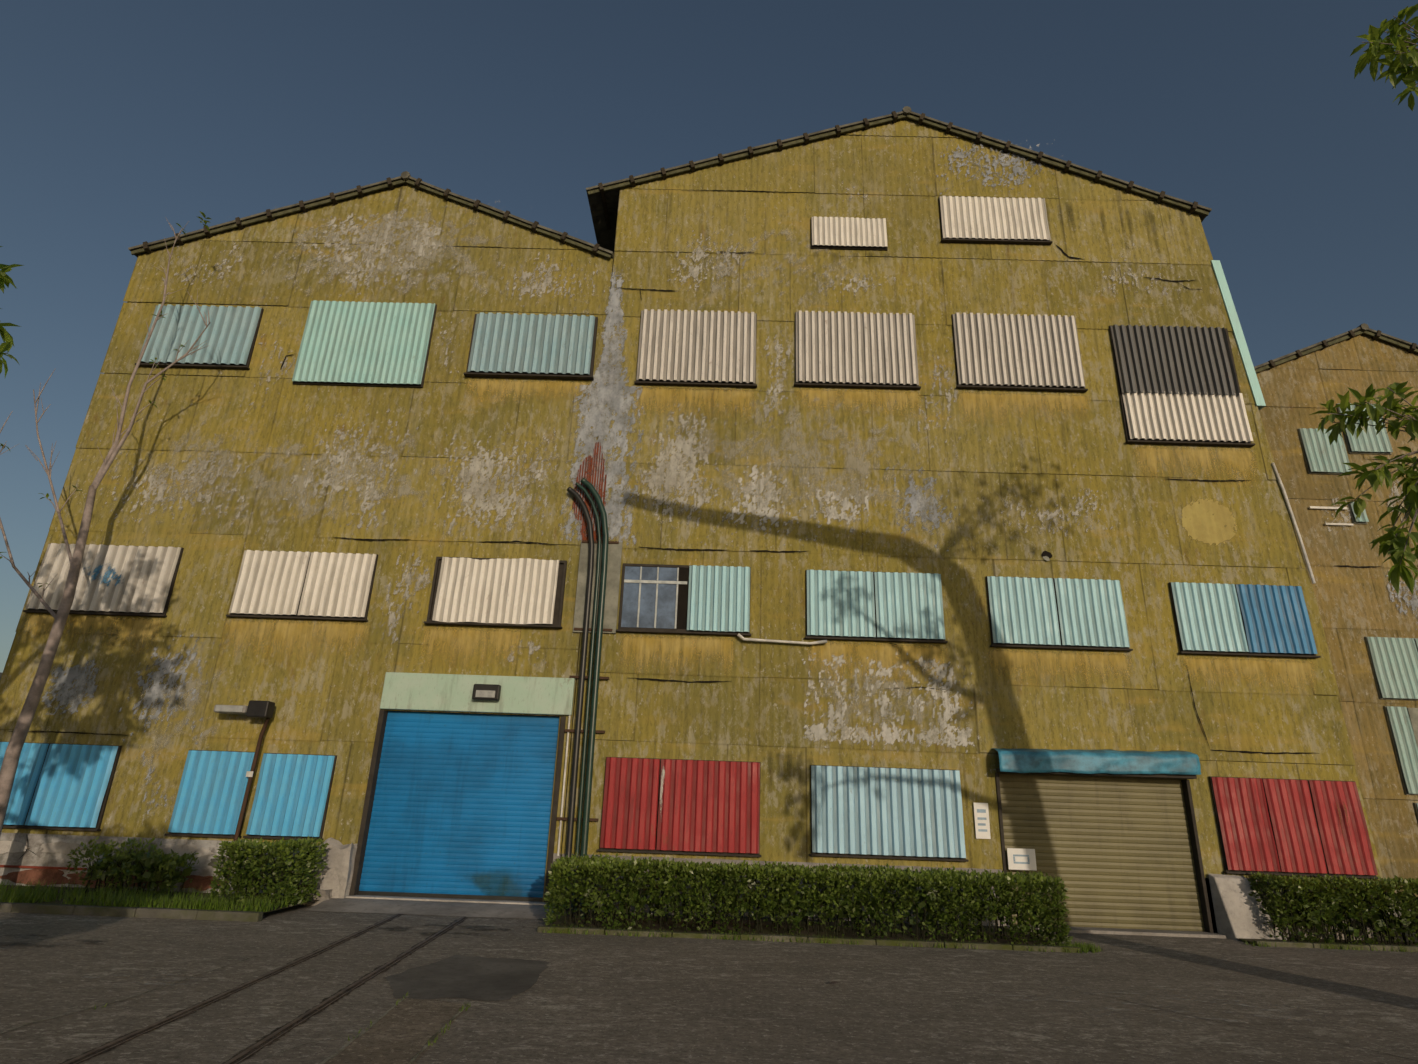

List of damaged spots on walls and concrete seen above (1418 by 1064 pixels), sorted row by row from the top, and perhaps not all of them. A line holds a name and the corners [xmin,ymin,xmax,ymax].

peeling [105,206,960,551]
rust [572,442,607,541]
peeling [1387,575,1418,630]
peeling [42,660,99,715]
peeling [119,635,214,822]
peeling [802,653,979,753]